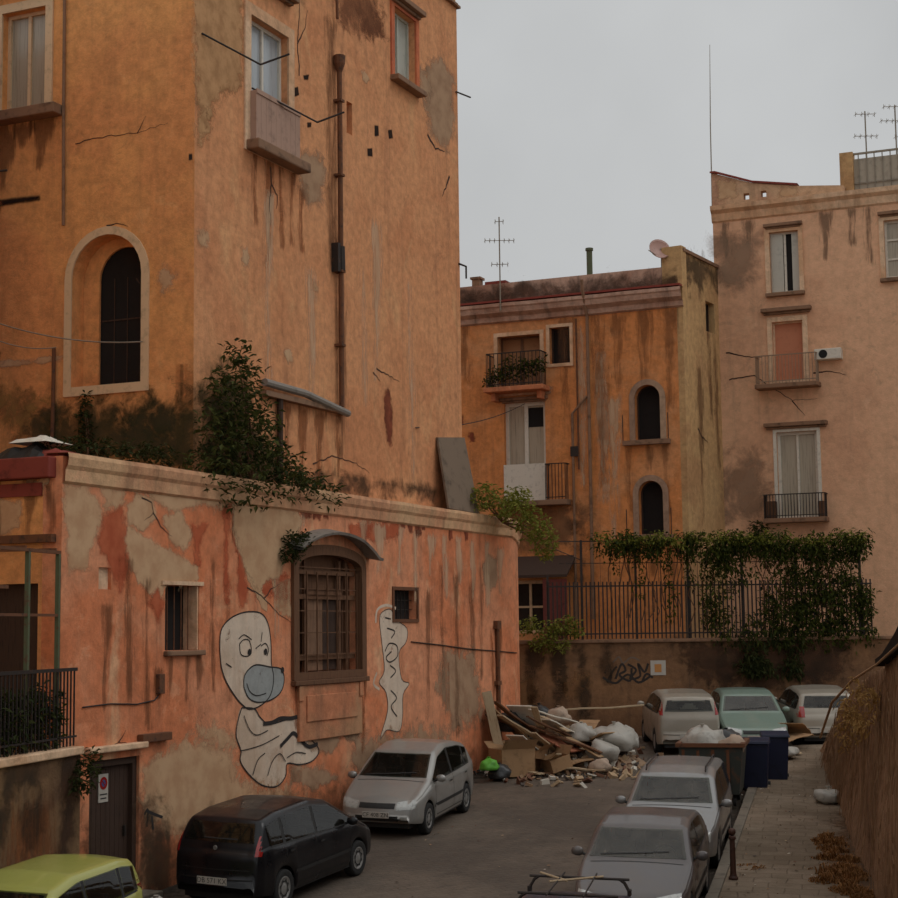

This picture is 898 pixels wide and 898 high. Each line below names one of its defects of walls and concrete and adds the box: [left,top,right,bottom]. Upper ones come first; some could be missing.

leakage [339,0,383,41]
crack [75,118,167,145]
flaking render [420,57,456,147]
flaking render [300,150,326,205]
leakage [460,222,758,304]
leakage [820,212,831,259]
crack [726,352,817,414]
crack [142,497,171,536]
flaking render [62,484,329,619]
leakage [414,531,504,605]
leakage [60,756,79,854]